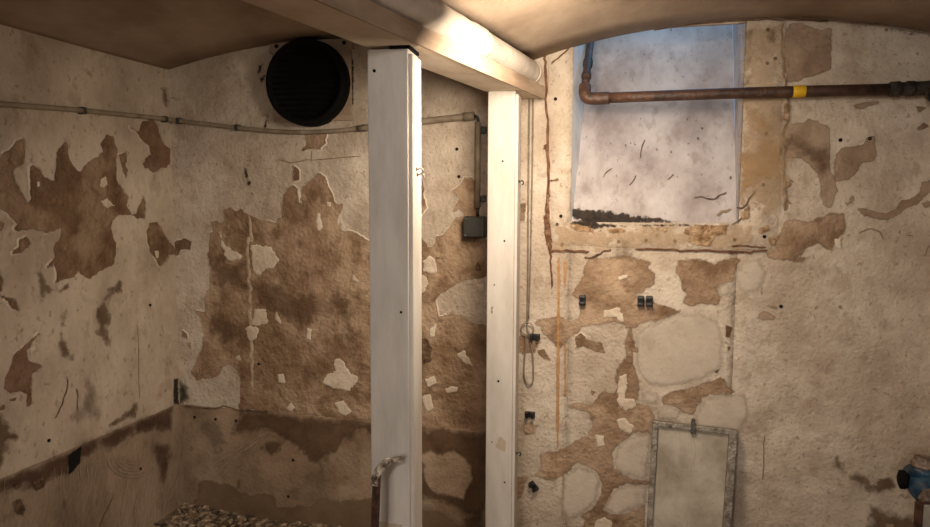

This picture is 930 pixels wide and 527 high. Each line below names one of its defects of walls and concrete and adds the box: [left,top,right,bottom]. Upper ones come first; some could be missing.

peeling [0,135,191,285]
peeling [128,119,170,174]
peeling [760,104,930,262]
peeling [0,277,20,313]
peeling [0,331,42,410]
damp [0,379,188,492]
peeling [181,164,371,421]
damp [236,413,371,462]
peeling [421,176,487,430]
peeling [517,255,740,527]